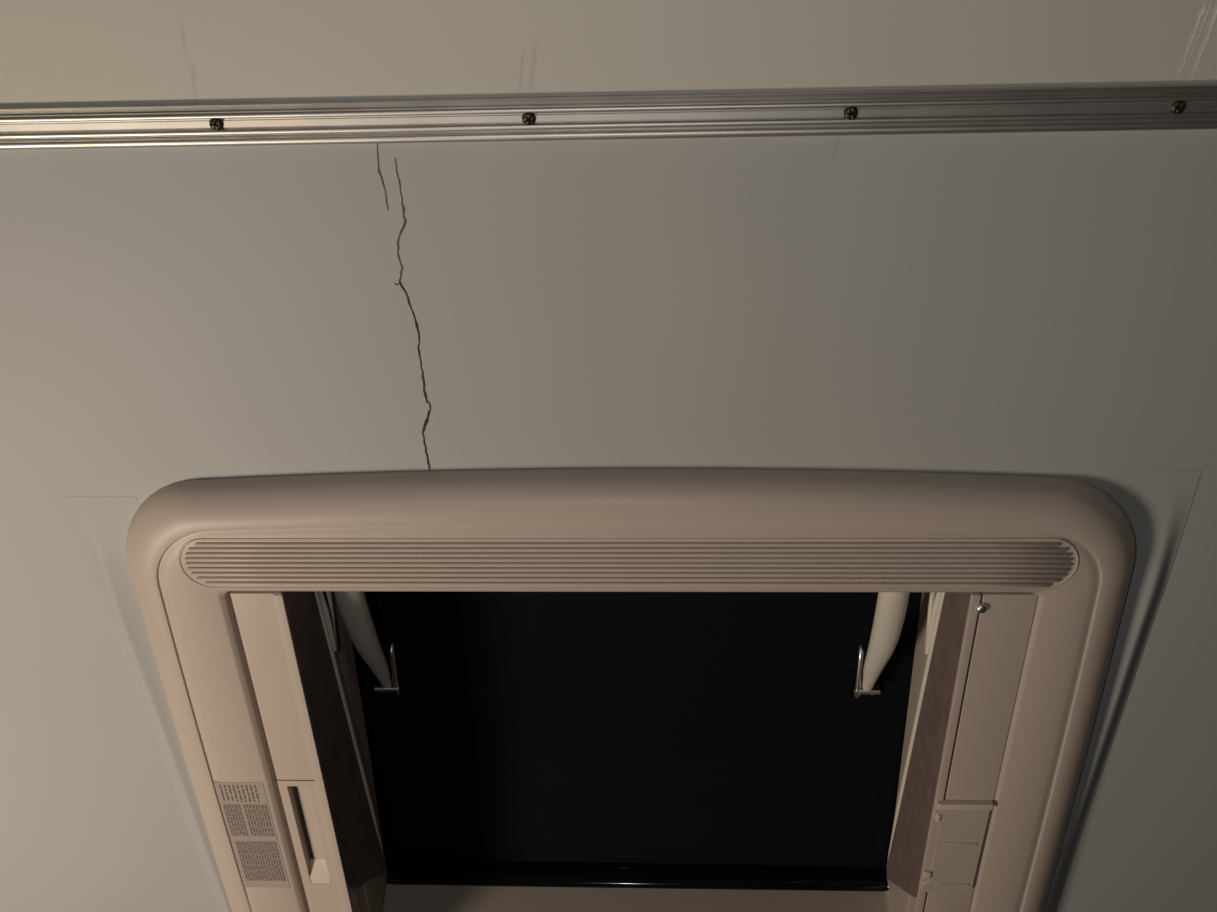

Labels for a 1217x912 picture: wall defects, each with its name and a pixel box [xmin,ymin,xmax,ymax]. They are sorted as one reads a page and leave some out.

crack [377,143,431,471]